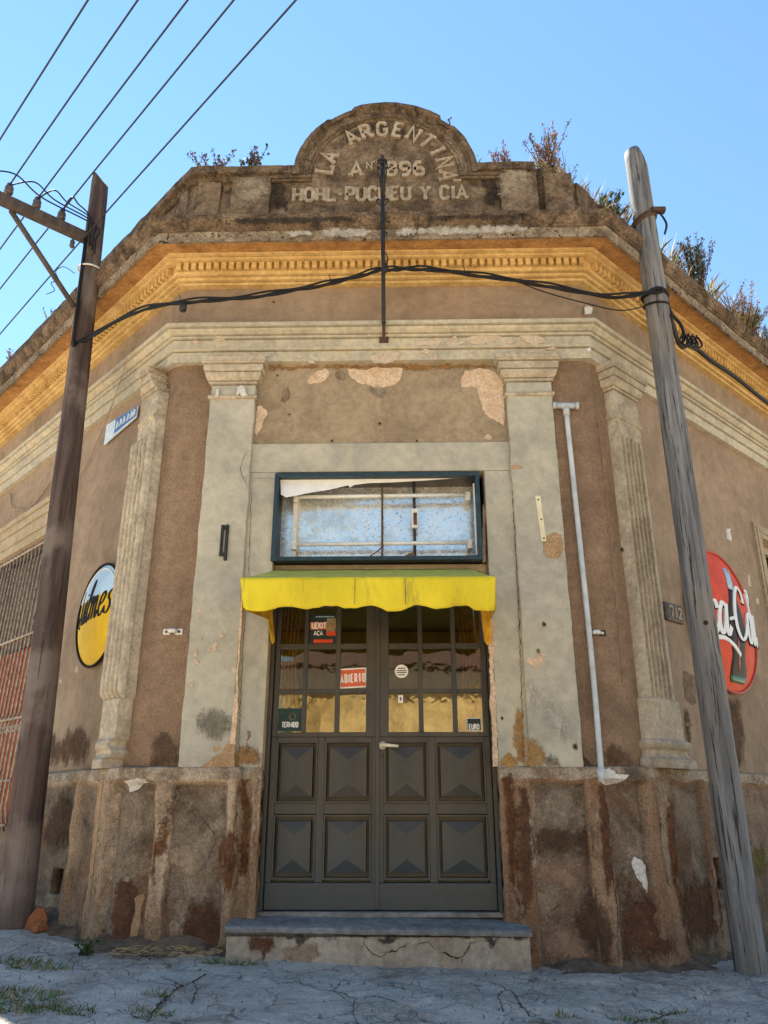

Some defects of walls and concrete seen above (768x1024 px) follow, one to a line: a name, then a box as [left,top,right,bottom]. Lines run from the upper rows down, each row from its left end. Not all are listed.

flaking render [254,405,268,435]
flaking render [287,346,403,397]
flaking render [461,368,505,425]
water stain [500,709,558,767]
peeling [124,778,149,792]
water stain [218,731,260,891]
water stain [597,744,672,838]
water stain [94,780,137,939]
flaking render [631,857,648,892]
water stain [183,897,220,949]
water stain [574,876,724,964]
crack [364,941,476,963]